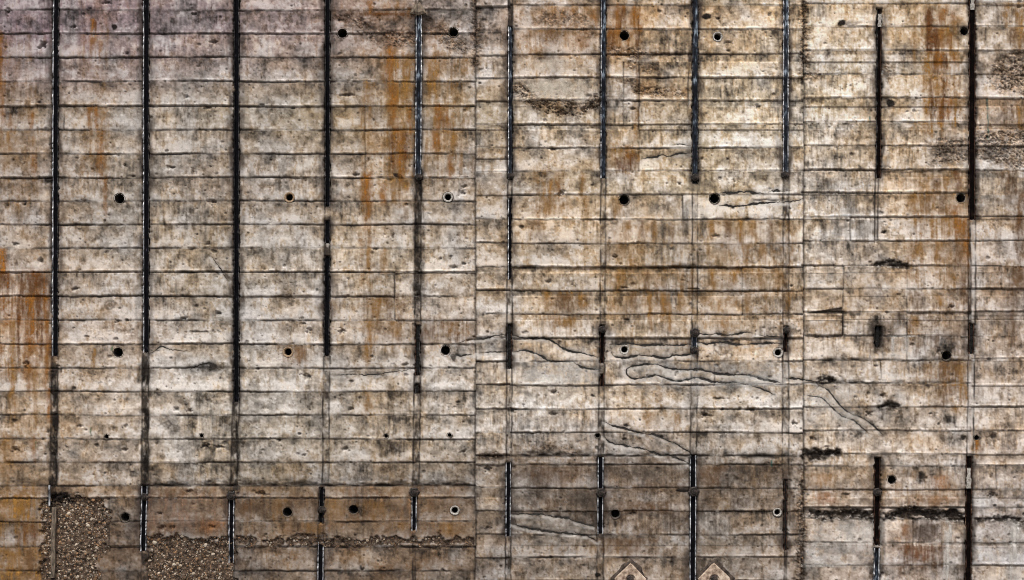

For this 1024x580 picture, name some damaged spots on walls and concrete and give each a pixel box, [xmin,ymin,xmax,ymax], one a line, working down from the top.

corrosion [914,9,961,137]
spalling [991,52,1024,95]
spalling [512,84,601,116]
corrosion [380,46,413,207]
corrosion [361,173,371,218]
corrosion [911,171,969,303]
crack [451,332,883,435]
crack [605,422,692,464]
spalling [37,495,112,580]
spalling [145,533,475,580]
crack [514,513,597,541]